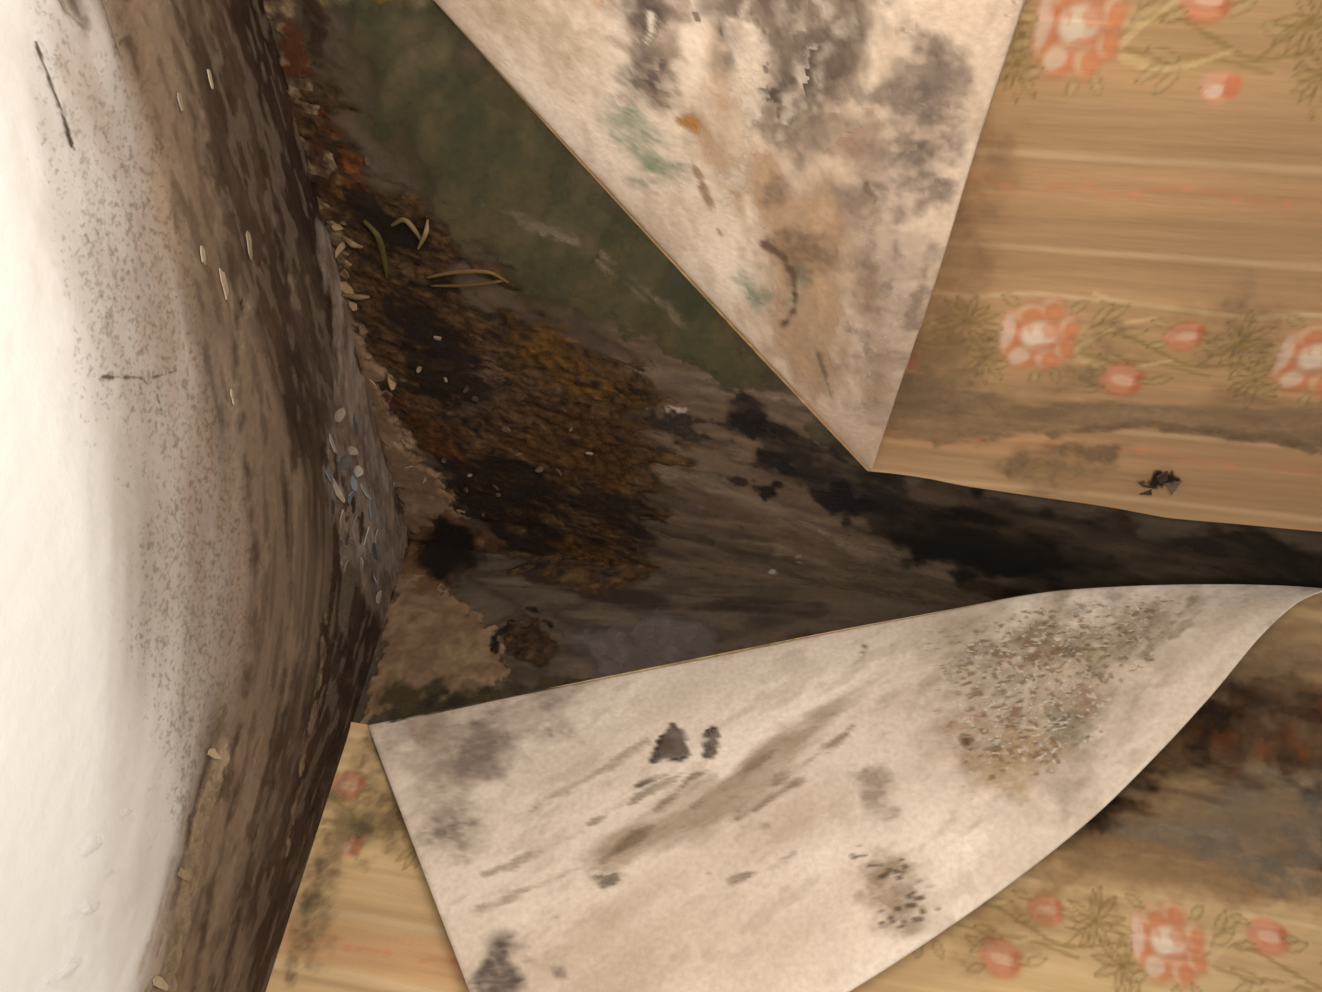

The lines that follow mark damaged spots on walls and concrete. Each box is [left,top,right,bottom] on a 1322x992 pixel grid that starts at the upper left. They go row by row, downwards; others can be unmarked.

peeling [200,246,229,299]
damp [90,0,479,992]
flaking render [263,0,1005,724]
damp [629,0,689,105]
damp [693,0,929,395]
damp [834,35,971,208]
damp [865,346,1322,485]
damp [646,393,1322,788]
damp [381,677,566,777]
damp [596,706,837,888]
damp [1060,624,1322,896]
damp [854,856,924,932]